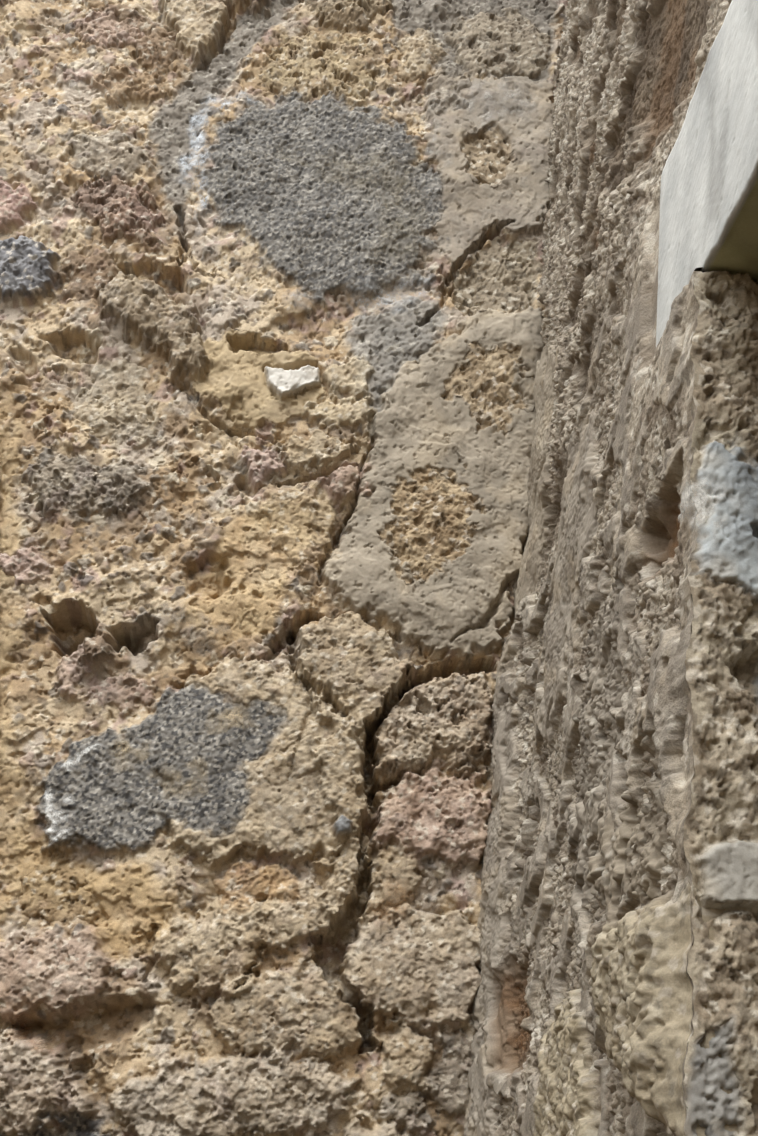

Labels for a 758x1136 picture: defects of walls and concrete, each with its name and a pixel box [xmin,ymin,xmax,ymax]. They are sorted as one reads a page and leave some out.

crack [416,220,515,327]
crack [264,411,376,781]
crack [308,575,510,1054]